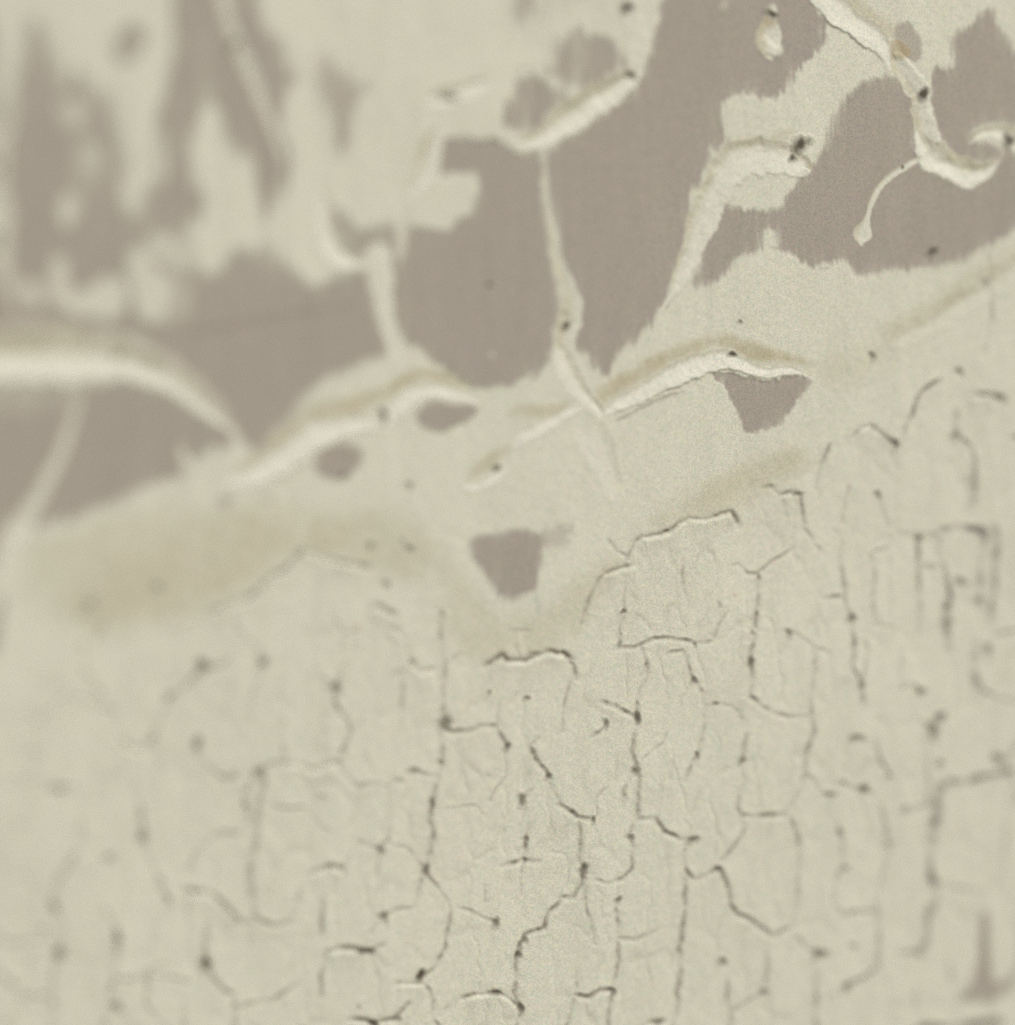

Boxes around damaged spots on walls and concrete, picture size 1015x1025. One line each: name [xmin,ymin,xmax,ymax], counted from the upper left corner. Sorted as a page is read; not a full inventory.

peeling [0,0,1015,578]
peeling [466,518,581,605]
crack [76,245,1015,1025]